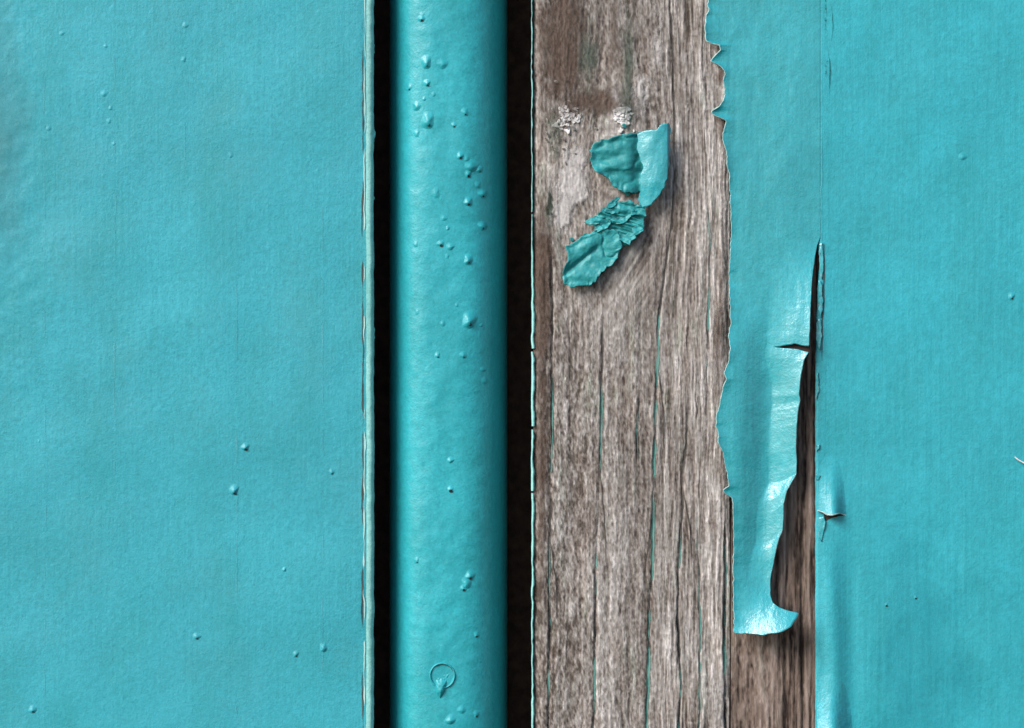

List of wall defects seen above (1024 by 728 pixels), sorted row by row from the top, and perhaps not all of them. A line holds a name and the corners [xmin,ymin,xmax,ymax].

peeling [552,105,581,134]
peeling [562,104,671,288]
peeling [704,0,825,636]